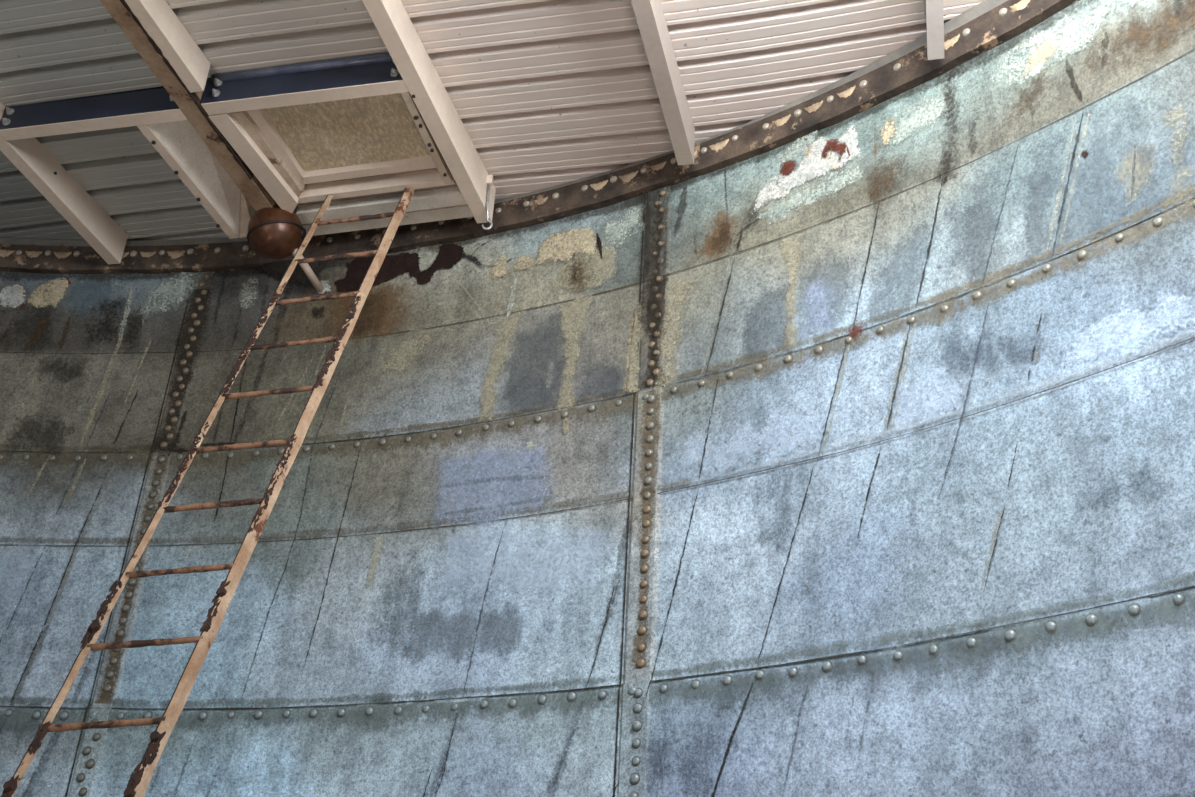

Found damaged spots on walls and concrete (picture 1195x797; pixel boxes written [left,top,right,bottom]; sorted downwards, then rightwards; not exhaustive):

rust [780,160,797,176]
rust [821,139,850,161]
peeling [752,86,955,224]
peeling [0,277,71,308]
rust [312,286,405,338]
crack [857,178,943,538]
crack [301,441,363,677]
crack [464,531,503,691]
crack [711,201,880,797]
crack [981,442,1018,589]
crack [423,719,456,797]